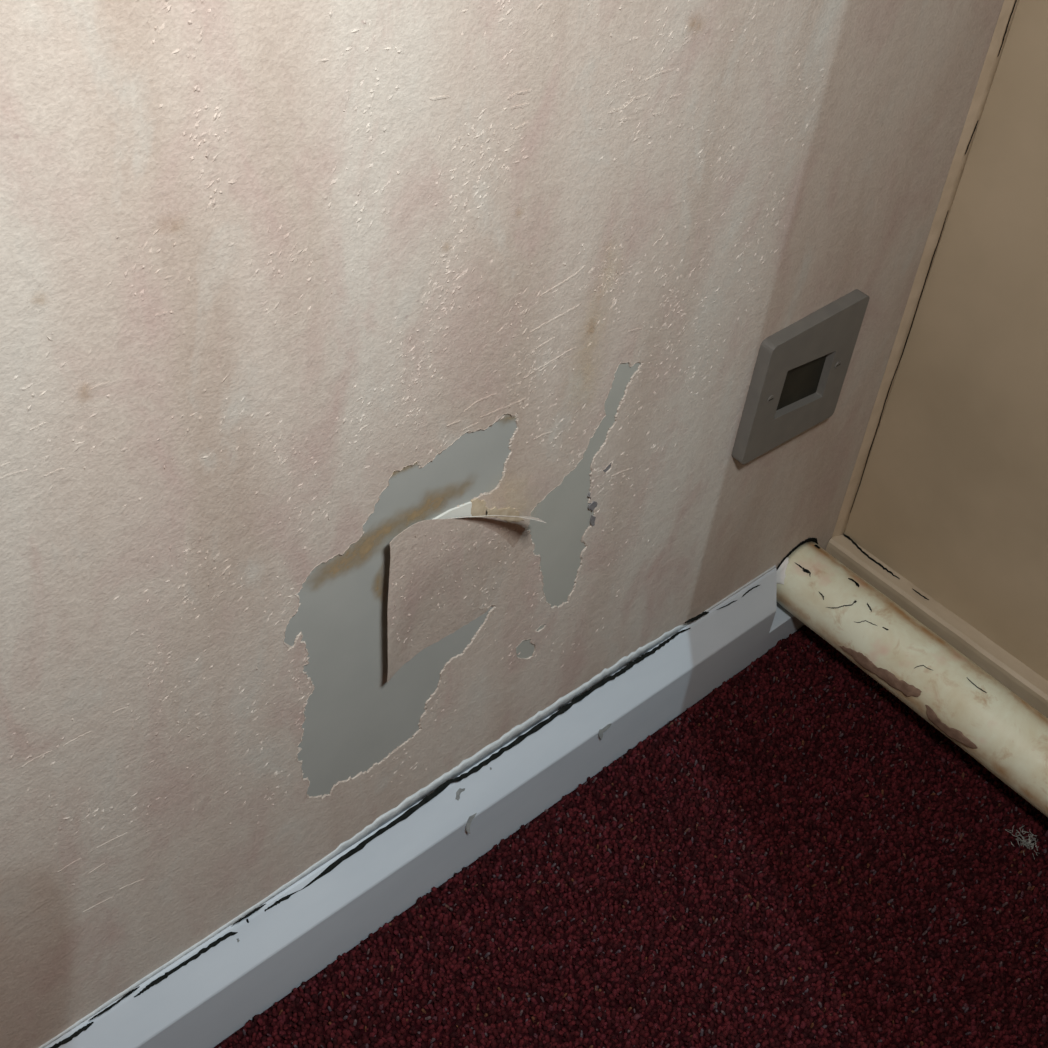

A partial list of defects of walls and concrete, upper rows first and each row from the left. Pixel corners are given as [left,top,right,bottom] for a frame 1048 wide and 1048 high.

crack [997,0,1017,57]
peeling [283,362,643,799]
crack [49,537,889,1048]
crack [843,212,948,600]